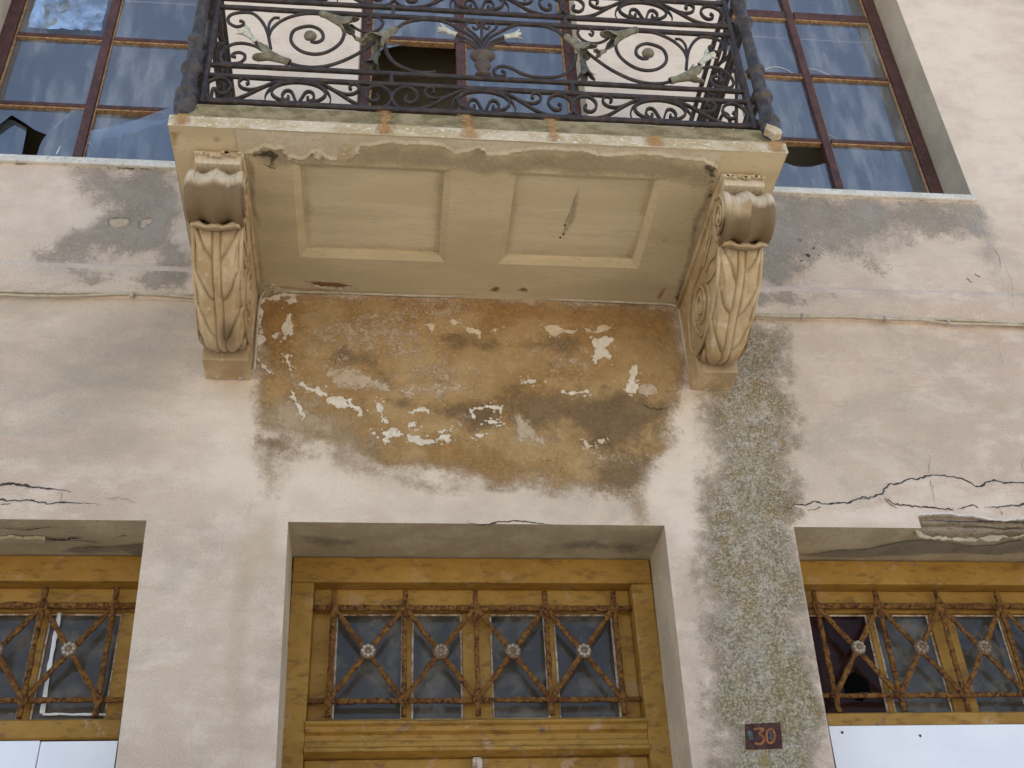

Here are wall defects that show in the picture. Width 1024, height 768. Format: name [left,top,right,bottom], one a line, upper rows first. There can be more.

peeling [193,130,766,182]
damp [37,167,191,289]
damp [758,195,982,305]
peeling [256,283,299,374]
peeling [540,323,615,366]
peeling [288,381,456,446]
damp [258,287,686,516]
peeling [469,402,507,441]
crack [0,482,133,530]
crack [468,520,551,553]
crack [784,458,1024,515]
spalling [915,512,1024,543]